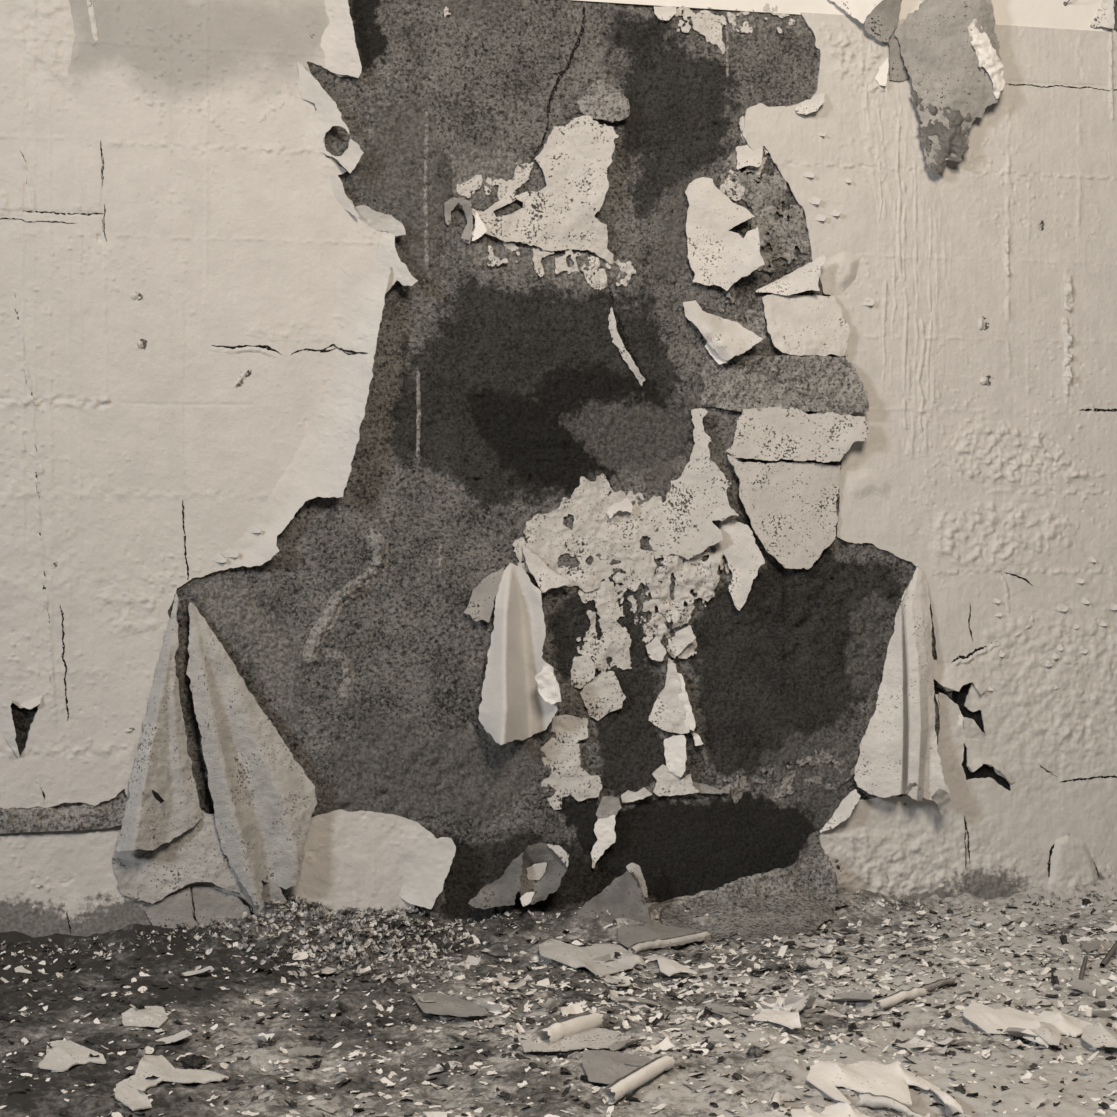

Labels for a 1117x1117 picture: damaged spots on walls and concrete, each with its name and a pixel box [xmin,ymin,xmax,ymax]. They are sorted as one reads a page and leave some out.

peeling [1090,0,1117,30]
crack [1009,83,1117,91]
crack [1,140,107,242]
crack [209,344,366,358]
crack [1080,406,1117,414]
peeling [112,0,1005,929]
peeling [0,693,47,757]
crack [1040,765,1117,782]